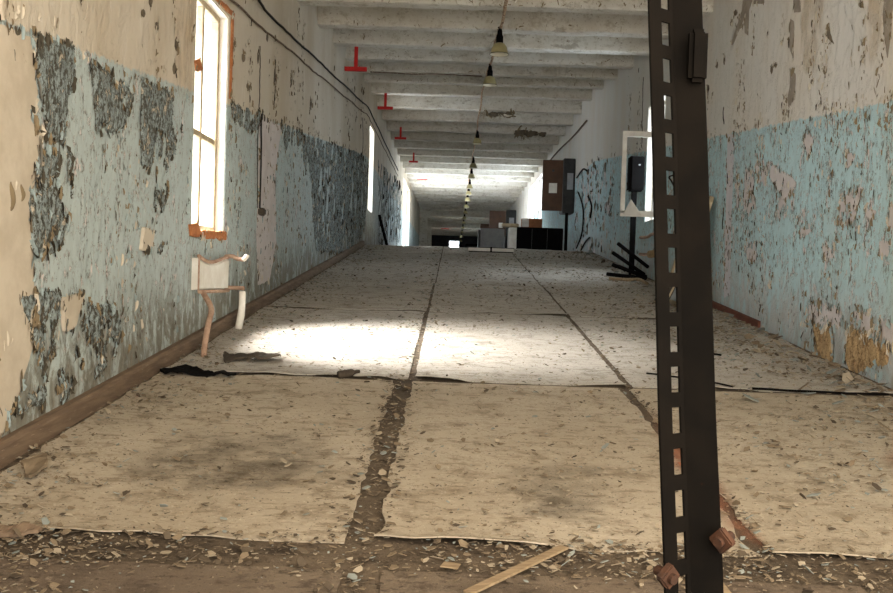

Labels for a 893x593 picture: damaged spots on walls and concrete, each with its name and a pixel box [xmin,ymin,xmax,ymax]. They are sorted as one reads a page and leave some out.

crack [0,0,8,21]
spalling [105,0,194,103]
flaking render [0,0,58,439]
peeling [99,125,158,363]
flaking render [56,289,85,340]